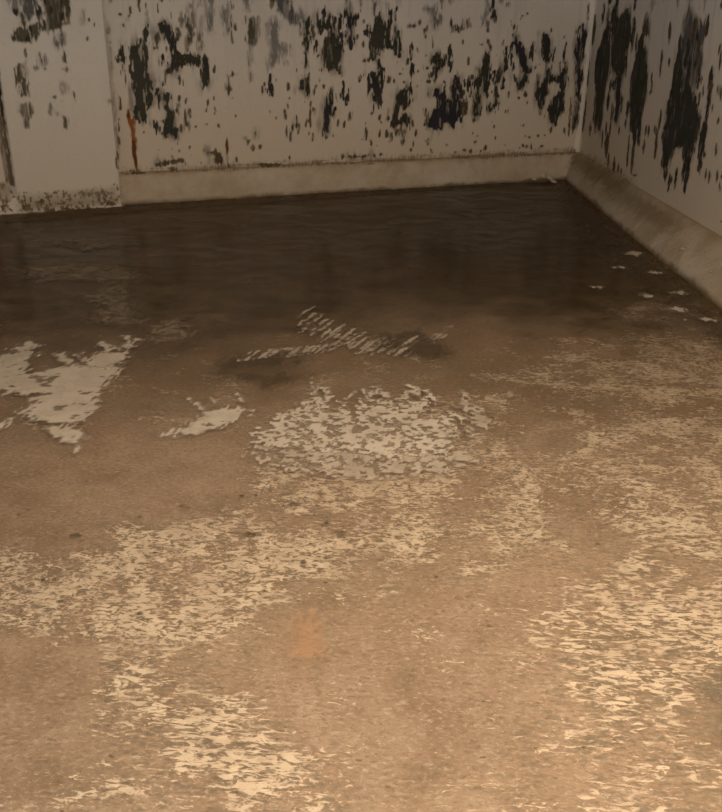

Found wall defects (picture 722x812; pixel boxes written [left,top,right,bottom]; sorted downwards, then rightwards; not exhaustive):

damp [12,0,71,71]
damp [227,17,257,45]
damp [271,0,303,66]
damp [408,0,469,48]
damp [483,0,497,32]
damp [15,64,33,128]
damp [0,83,14,186]
corrosion [127,110,140,172]
damp [202,156,415,171]
damp [564,180,722,313]